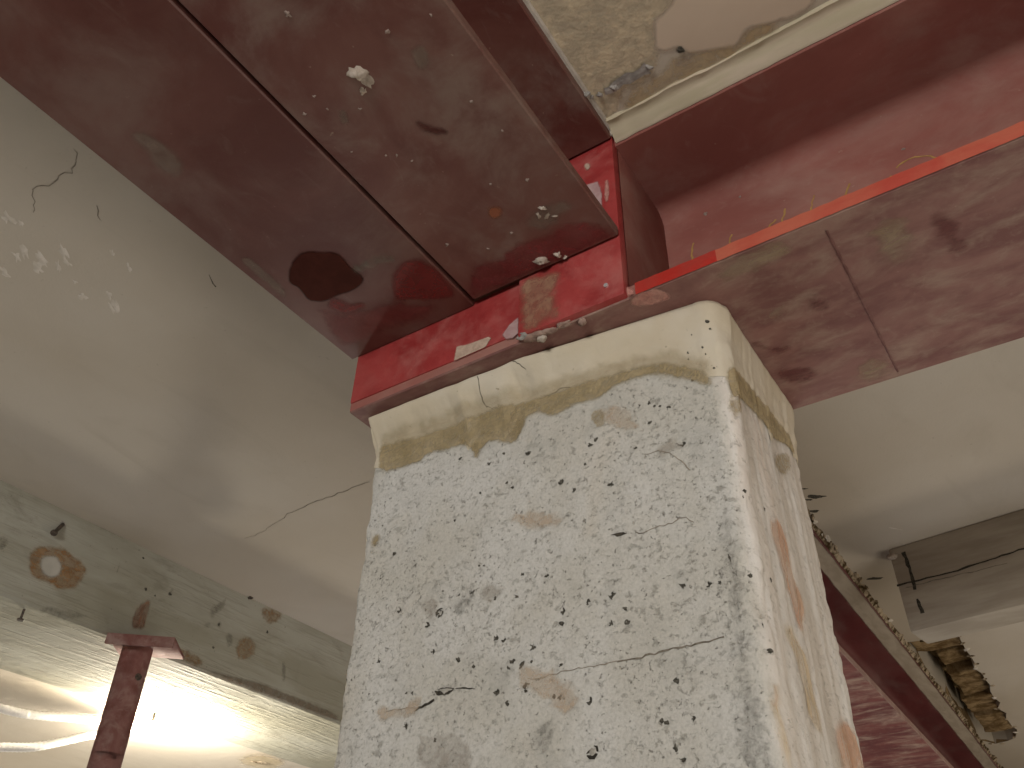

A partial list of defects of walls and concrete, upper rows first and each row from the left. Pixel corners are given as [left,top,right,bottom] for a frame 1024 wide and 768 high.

crack [31,151,78,213]
damp [289,252,363,302]
damp [379,363,709,471]
crack [612,517,693,537]
corrosion [30,547,85,588]
crack [897,548,1024,613]
crack [528,636,724,679]
spalling [807,507,1019,768]